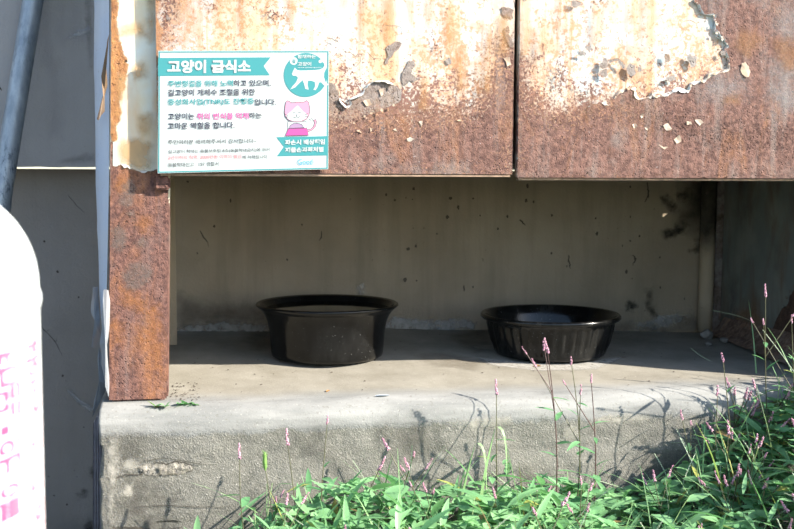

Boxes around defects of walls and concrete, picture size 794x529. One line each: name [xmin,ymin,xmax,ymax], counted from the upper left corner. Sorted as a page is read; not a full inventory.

spalling [138,462,193,476]